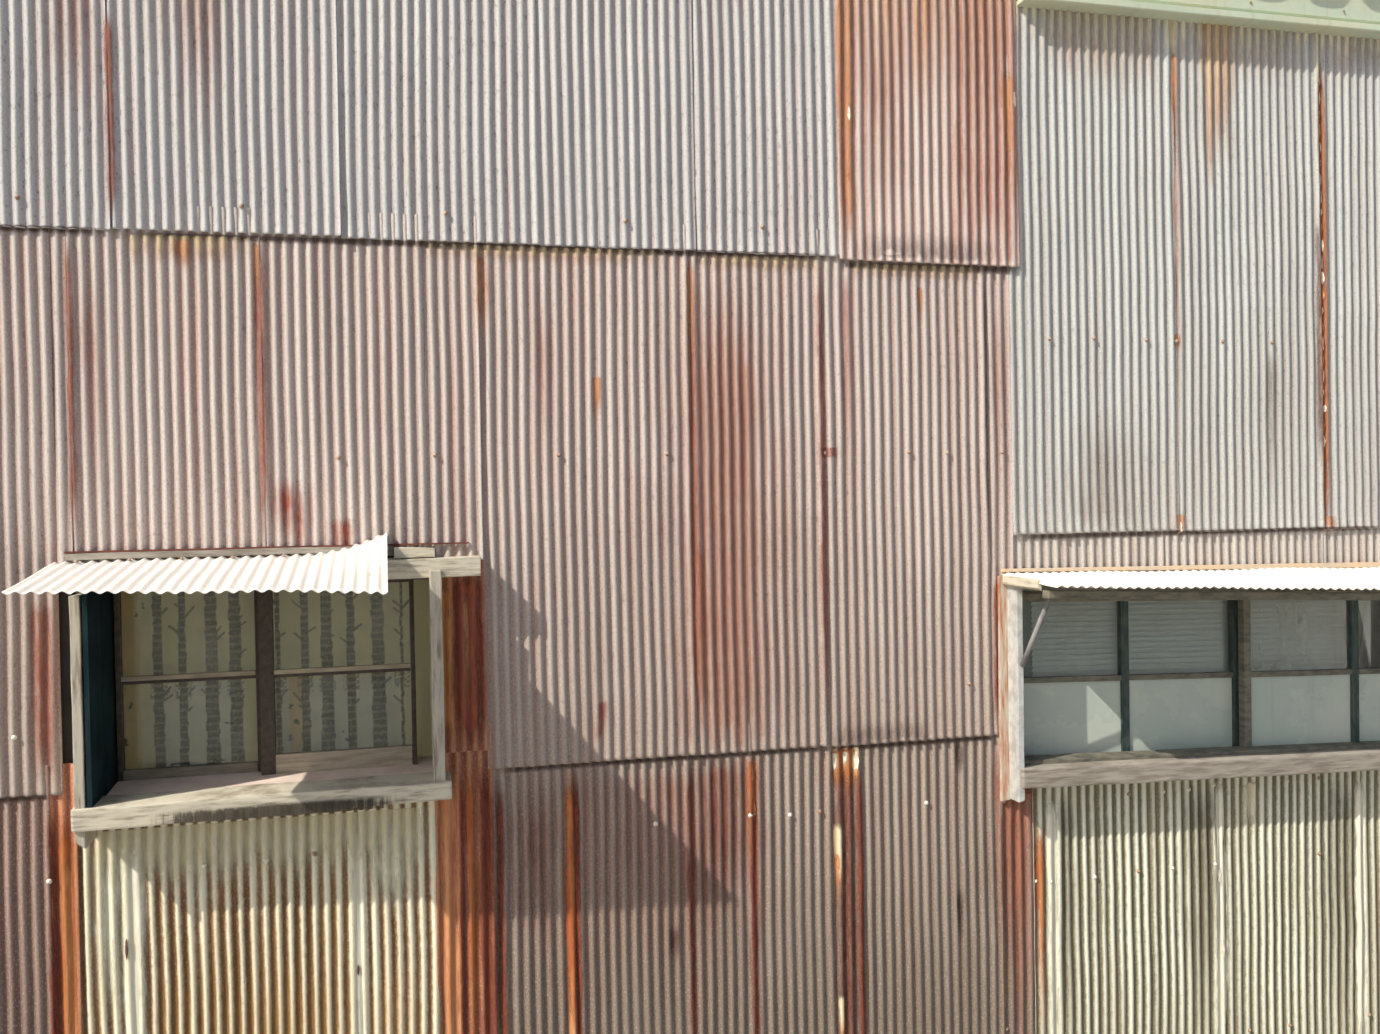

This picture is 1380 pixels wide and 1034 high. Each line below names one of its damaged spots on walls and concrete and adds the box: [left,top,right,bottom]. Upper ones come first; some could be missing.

corrosion [836,0,854,221]
corrosion [958,4,1016,211]
corrosion [687,268,735,672]
corrosion [442,578,485,737]
corrosion [439,778,508,1034]
corrosion [565,787,582,1034]
corrosion [687,785,696,1034]
corrosion [711,763,760,1034]
corrosion [996,777,1029,966]